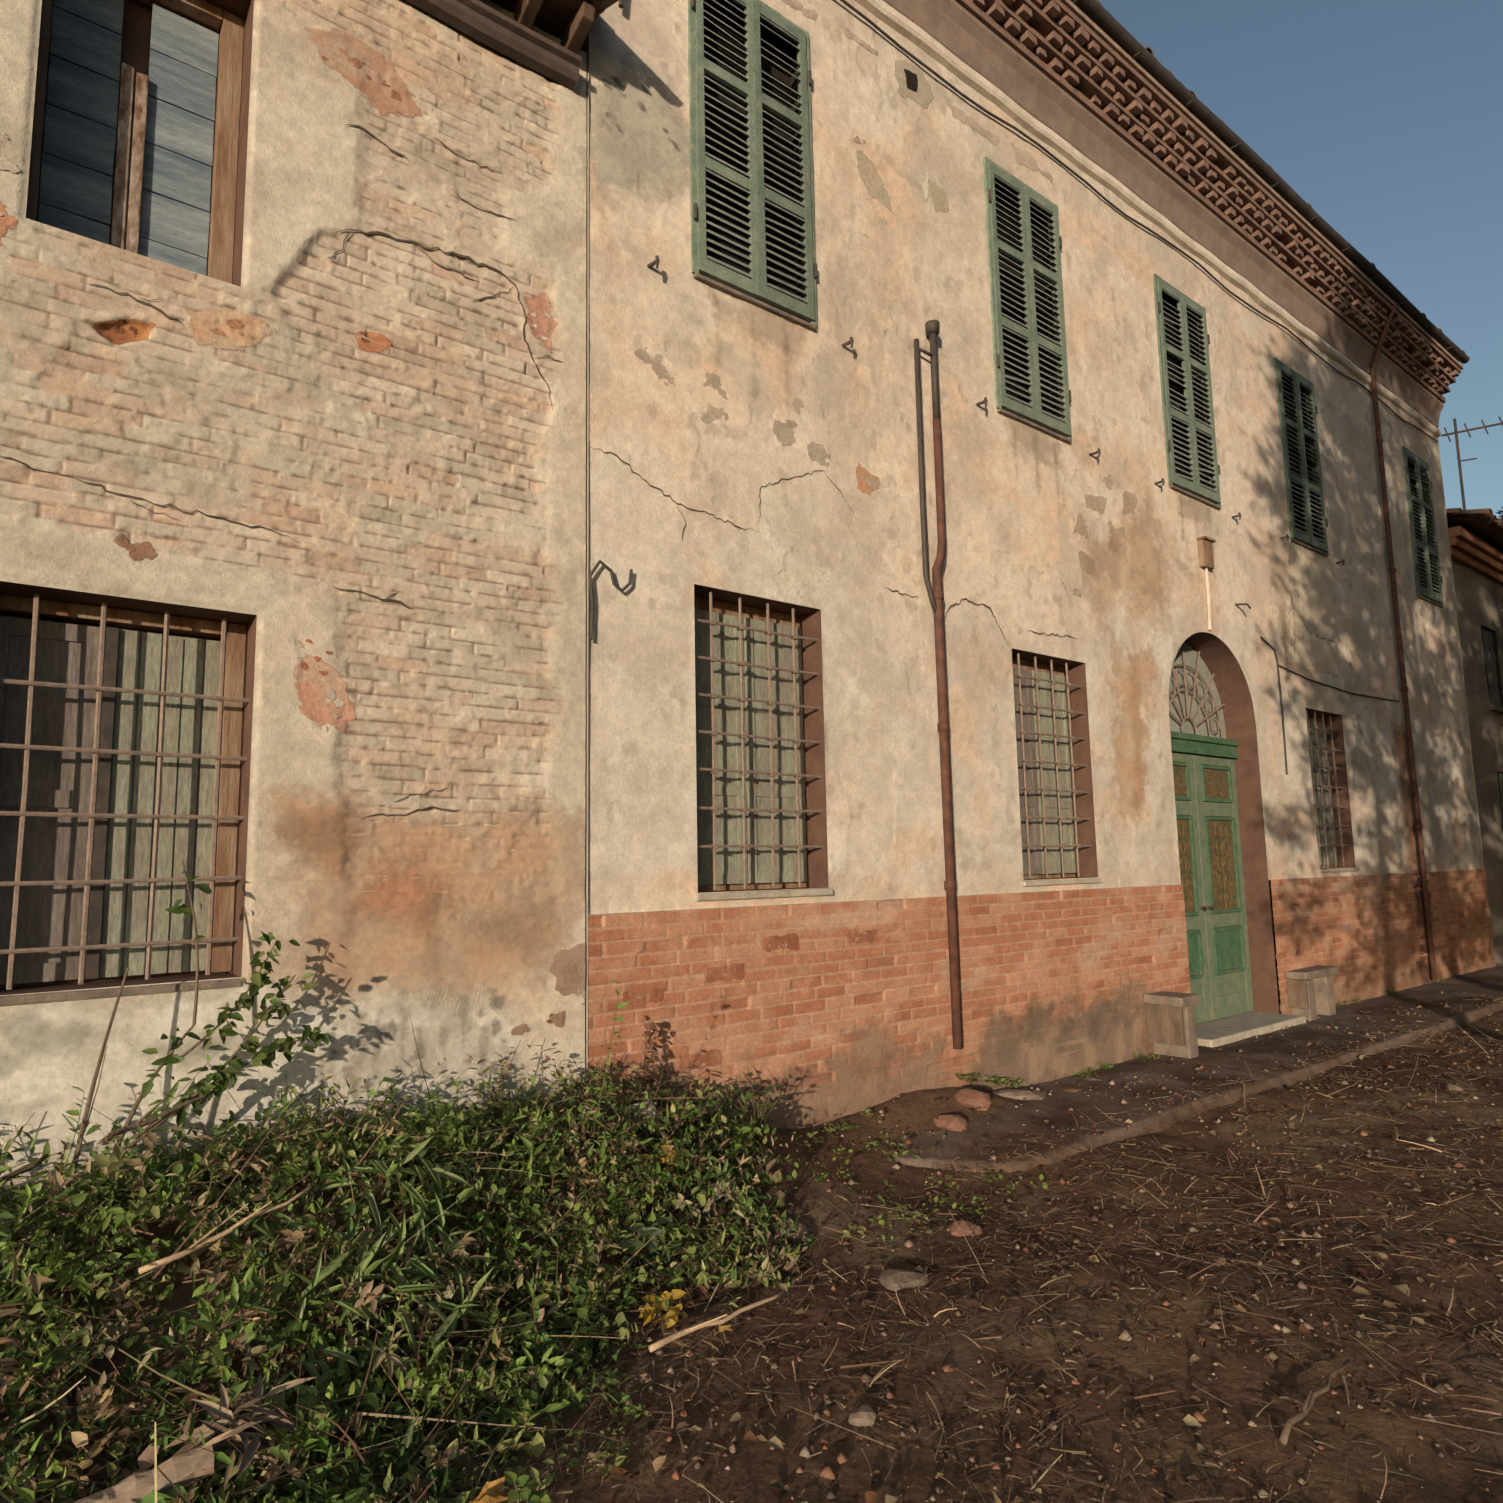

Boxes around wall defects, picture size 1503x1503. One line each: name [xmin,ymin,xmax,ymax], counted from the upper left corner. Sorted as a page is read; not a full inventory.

spalling [304,27,421,118]
peeling [0,201,18,246]
spalling [93,319,155,344]
peeling [186,307,277,350]
spalling [355,331,392,353]
crack [327,228,564,409]
spalling [525,293,558,352]
crack [0,456,304,543]
crack [591,447,854,539]
peeling [114,532,157,560]
peeling [293,639,356,732]
leakage [0,796,583,1185]